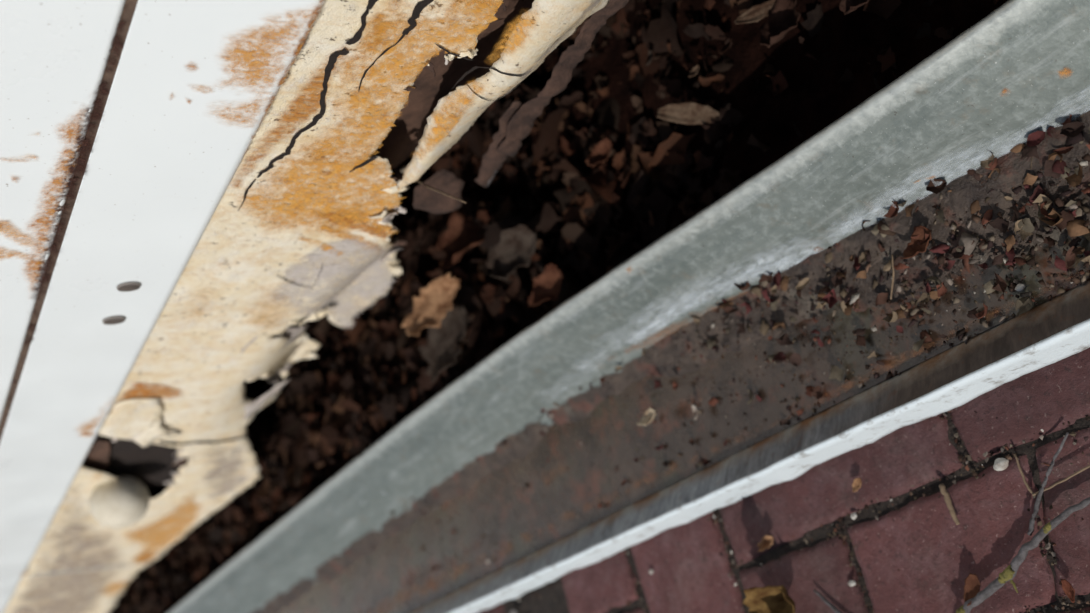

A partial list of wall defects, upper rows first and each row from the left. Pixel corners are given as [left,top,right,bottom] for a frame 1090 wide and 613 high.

rust [107,21,125,66]
crack [238,0,433,211]
rust [221,0,629,256]
crack [436,44,524,101]
rust [0,83,109,297]
peeling [241,0,610,421]
peeling [103,398,170,448]
rust [123,383,179,399]
peeling [163,449,189,485]
rust [127,496,200,564]